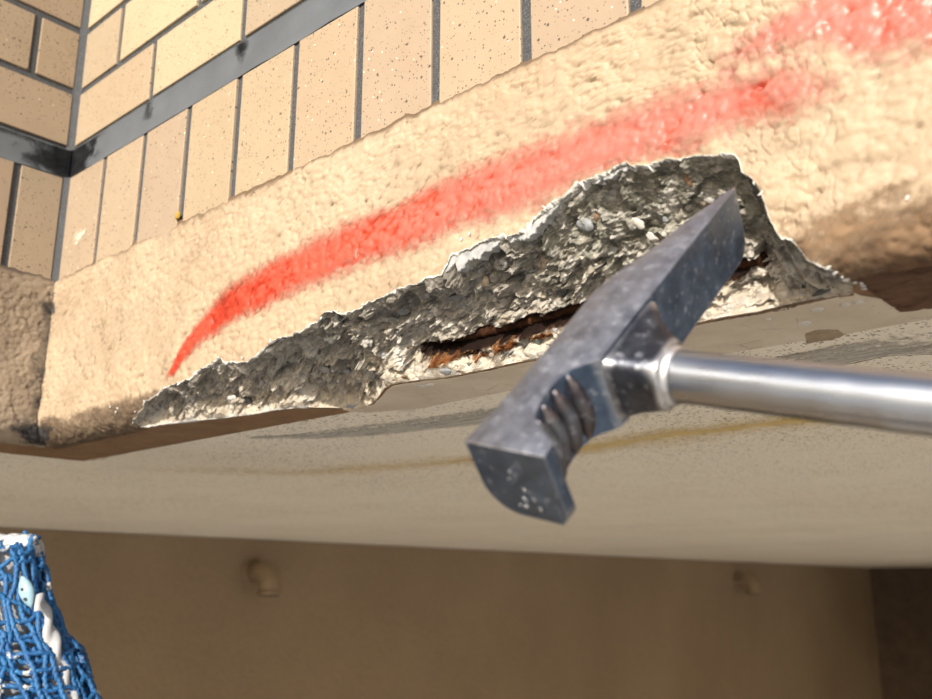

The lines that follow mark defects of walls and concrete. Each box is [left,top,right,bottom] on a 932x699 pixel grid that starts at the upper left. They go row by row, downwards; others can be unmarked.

spalling [132,152,932,428]
rust [725,267,750,285]
rust [420,300,587,368]
damp [11,423,51,446]